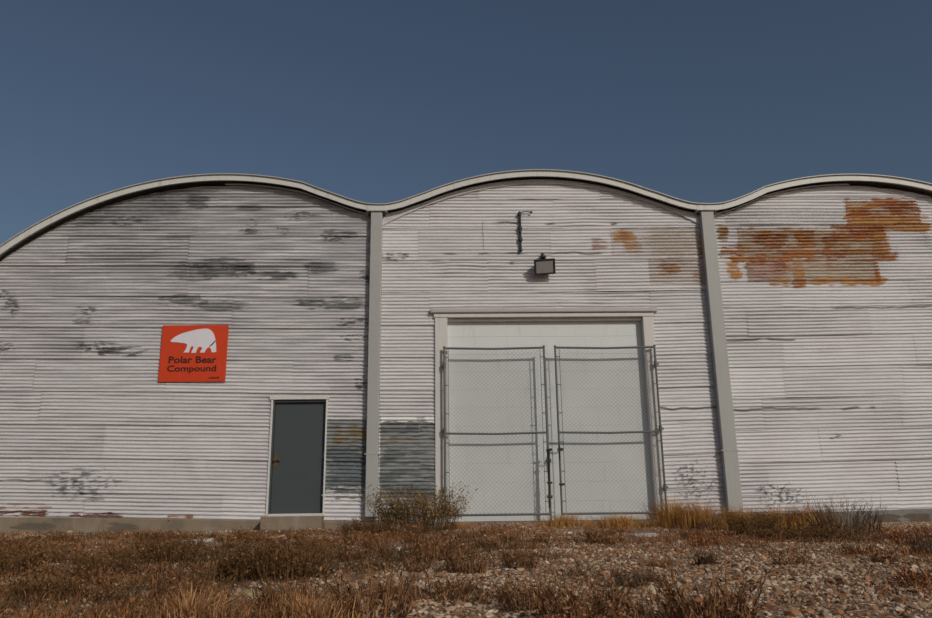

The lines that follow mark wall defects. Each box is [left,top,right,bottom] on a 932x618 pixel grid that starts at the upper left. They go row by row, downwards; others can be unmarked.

rust [591,228,704,284]
rust [716,198,931,288]
peeling [158,294,240,311]
peeling [322,419,367,504]
peeling [378,417,435,503]